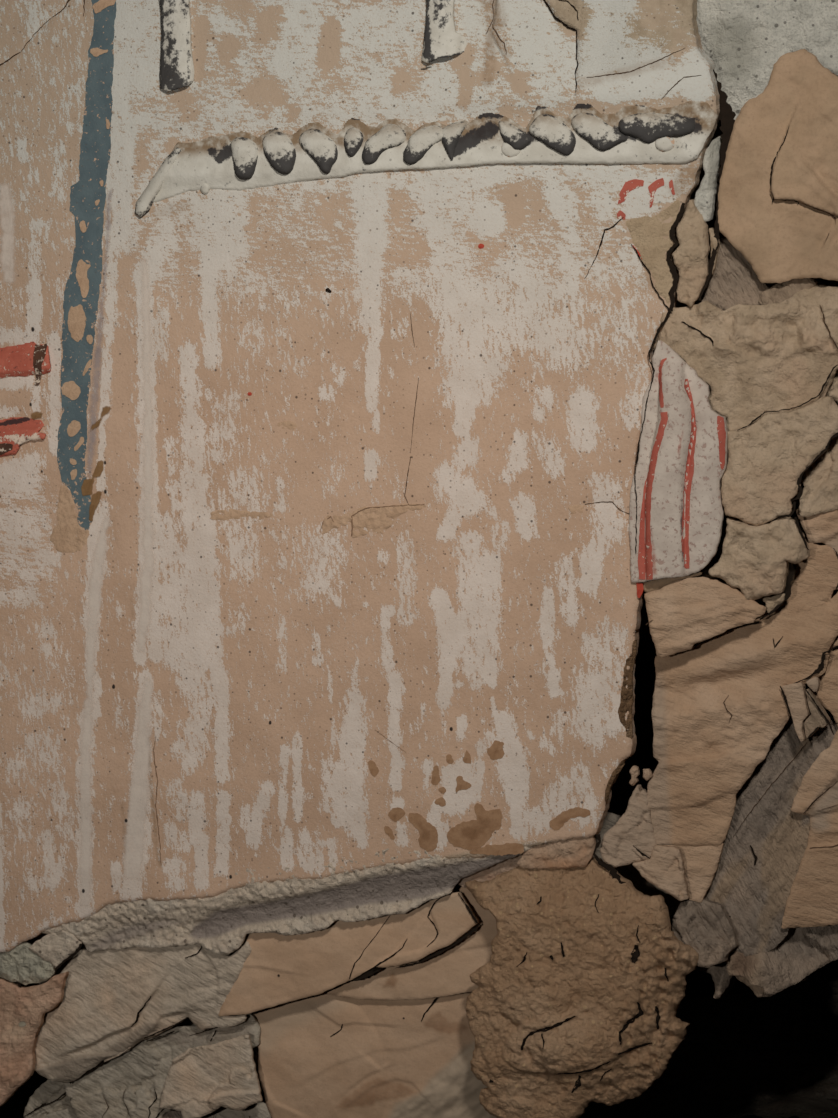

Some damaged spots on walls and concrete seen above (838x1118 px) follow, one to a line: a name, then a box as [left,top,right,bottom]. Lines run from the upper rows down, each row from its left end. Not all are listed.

crack [0,0,85,65]
spalling [707,120,723,148]
flaking render [626,165,725,308]
spalling [605,578,662,815]
peeling [782,677,831,742]
crack [247,893,480,1019]
spalling [680,966,752,1003]
spalling [24,1071,47,1084]